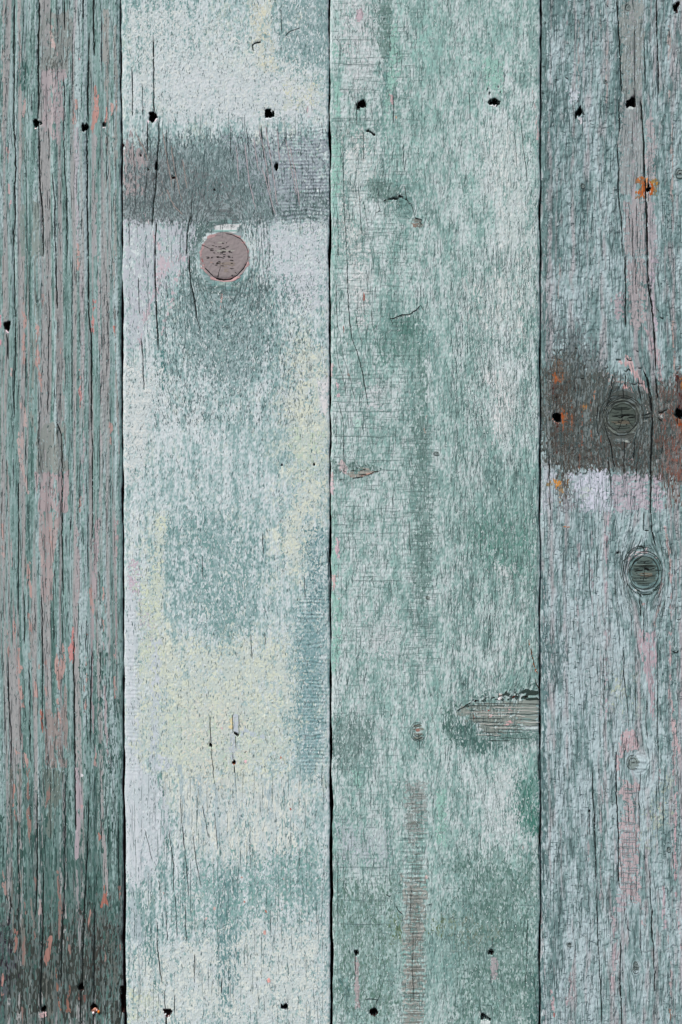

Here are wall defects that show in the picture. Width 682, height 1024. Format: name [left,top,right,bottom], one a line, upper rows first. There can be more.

crack [0,0,327,1024]
damp [0,0,411,1024]
crack [171,0,682,1024]
corrosion [548,355,602,469]
damp [532,2,682,513]
corrosion [635,176,660,199]
peeling [0,850,67,973]